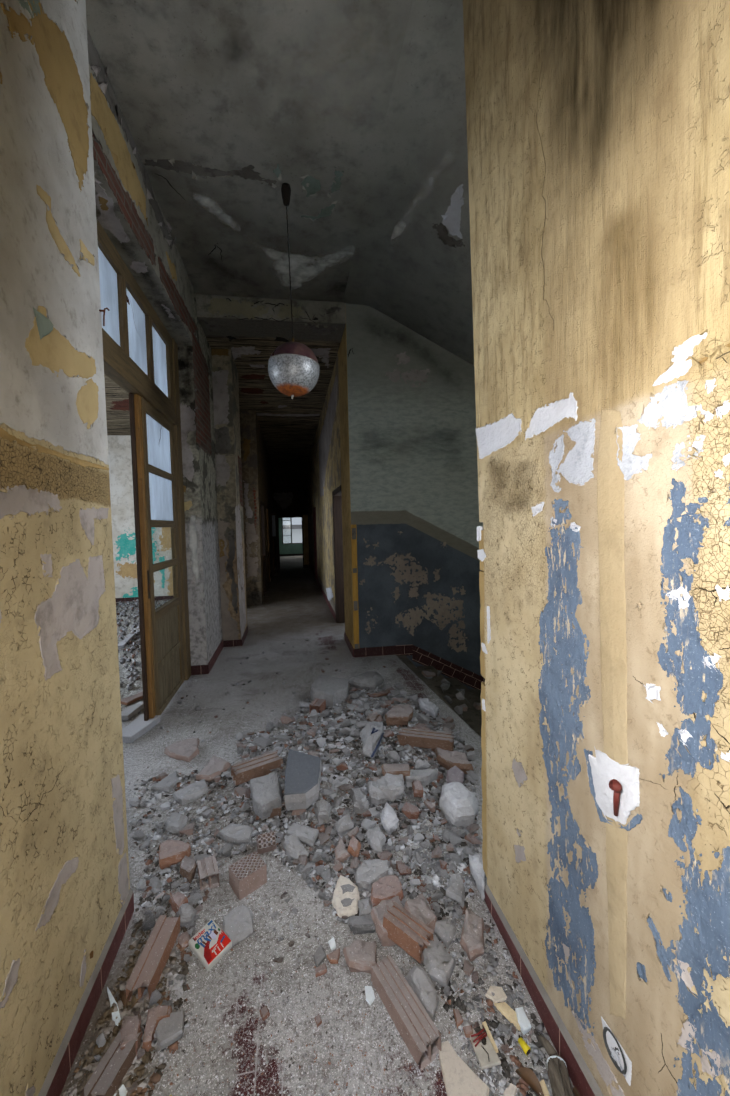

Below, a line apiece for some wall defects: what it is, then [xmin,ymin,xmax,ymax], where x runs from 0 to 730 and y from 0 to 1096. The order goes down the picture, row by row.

peeling [0,0,277,481]
peeling [0,481,62,519]
peeling [34,507,138,681]
peeling [151,527,173,596]
peeling [218,456,259,641]
peeling [363,539,467,653]
crack [693,587,730,606]
peeling [475,392,643,1096]
peeling [614,328,730,1096]